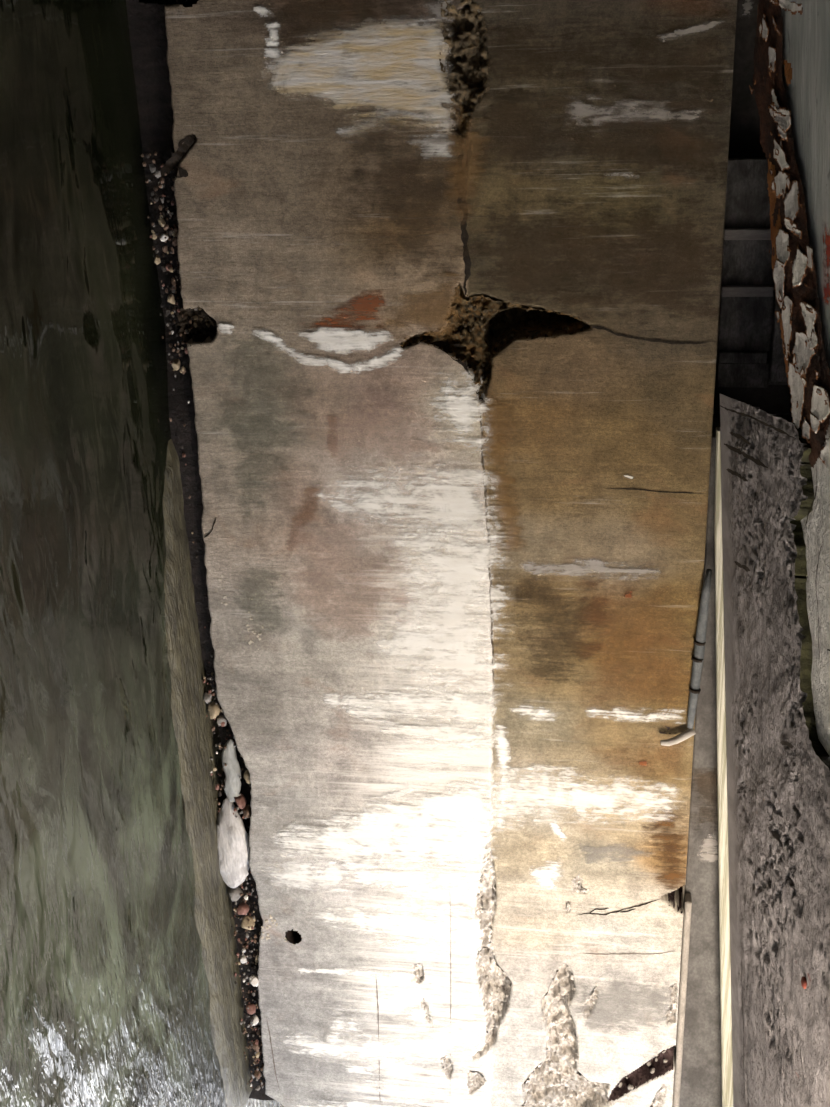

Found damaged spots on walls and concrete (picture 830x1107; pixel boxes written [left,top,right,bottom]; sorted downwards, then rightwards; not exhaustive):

water stain [262,0,726,264]
peeling [742,0,830,472]
rust [753,0,830,468]
rust [314,291,385,330]
spalling [400,283,592,404]
crack [588,325,711,344]
water stain [270,376,683,950]
crack [579,898,661,915]
hole [411,963,423,984]
hole [439,1055,454,1079]
hole [466,1071,487,1095]
spalling [650,1082,667,1107]